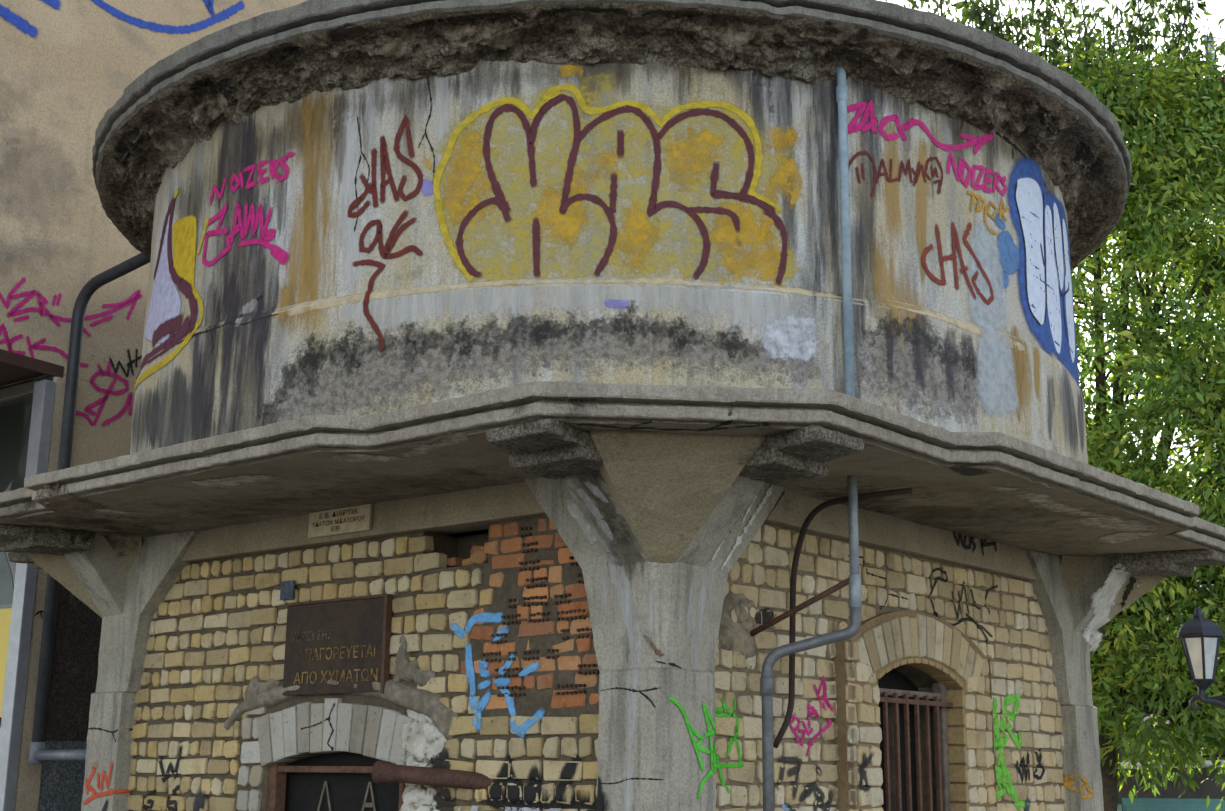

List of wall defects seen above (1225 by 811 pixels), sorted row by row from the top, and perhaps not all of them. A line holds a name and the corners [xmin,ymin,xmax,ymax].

spalling [266,7,775,86]
spalling [114,65,237,164]
crack [354,117,370,231]
crack [418,77,435,184]
water stain [132,99,821,451]
spalling [423,528,489,569]
peeling [1082,564,1140,651]